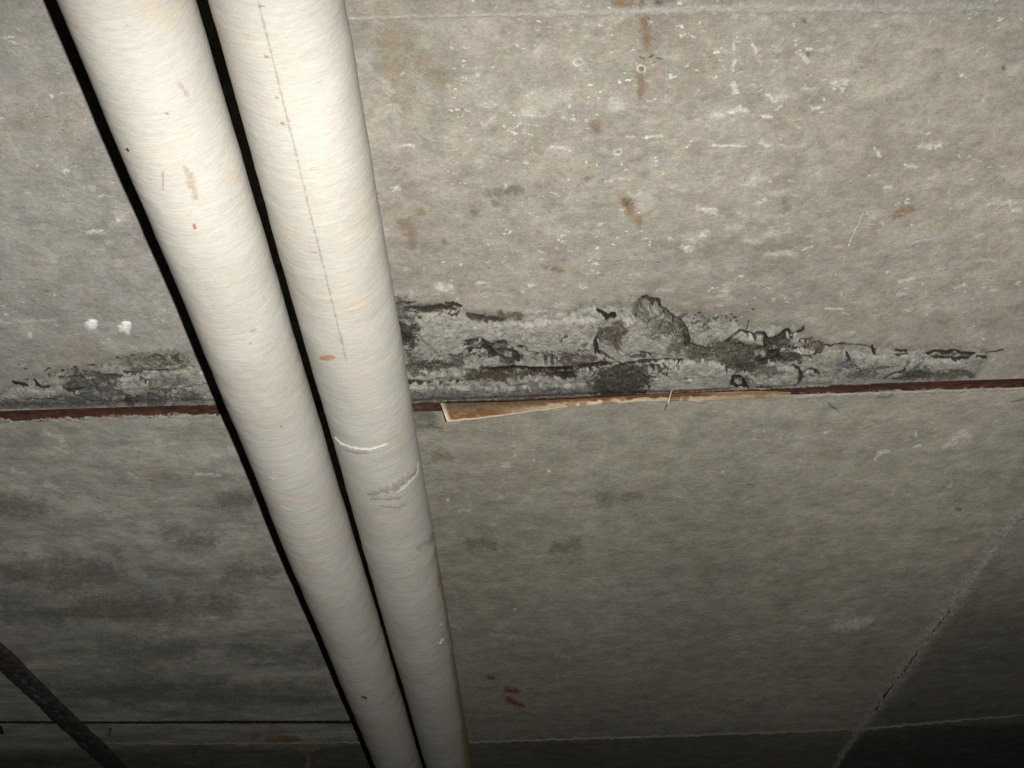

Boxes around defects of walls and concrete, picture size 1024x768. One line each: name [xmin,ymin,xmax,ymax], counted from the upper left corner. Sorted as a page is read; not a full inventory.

spalling [0,350,220,410]
spalling [396,294,846,422]